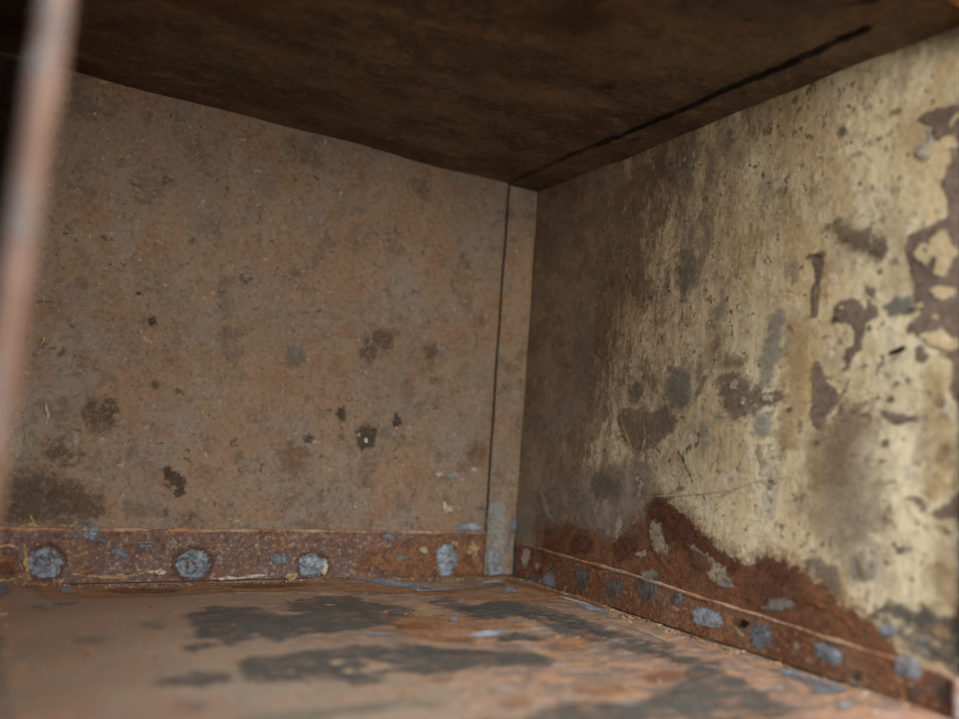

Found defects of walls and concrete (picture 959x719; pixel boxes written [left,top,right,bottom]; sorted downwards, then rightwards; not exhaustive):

crack [543,0,879,167]
peeling [808,104,959,444]
rust [0,530,603,607]
damp [150,517,801,719]
rust [536,490,907,657]
peeling [806,542,842,594]
peeling [928,486,959,545]
peeling [951,579,959,639]